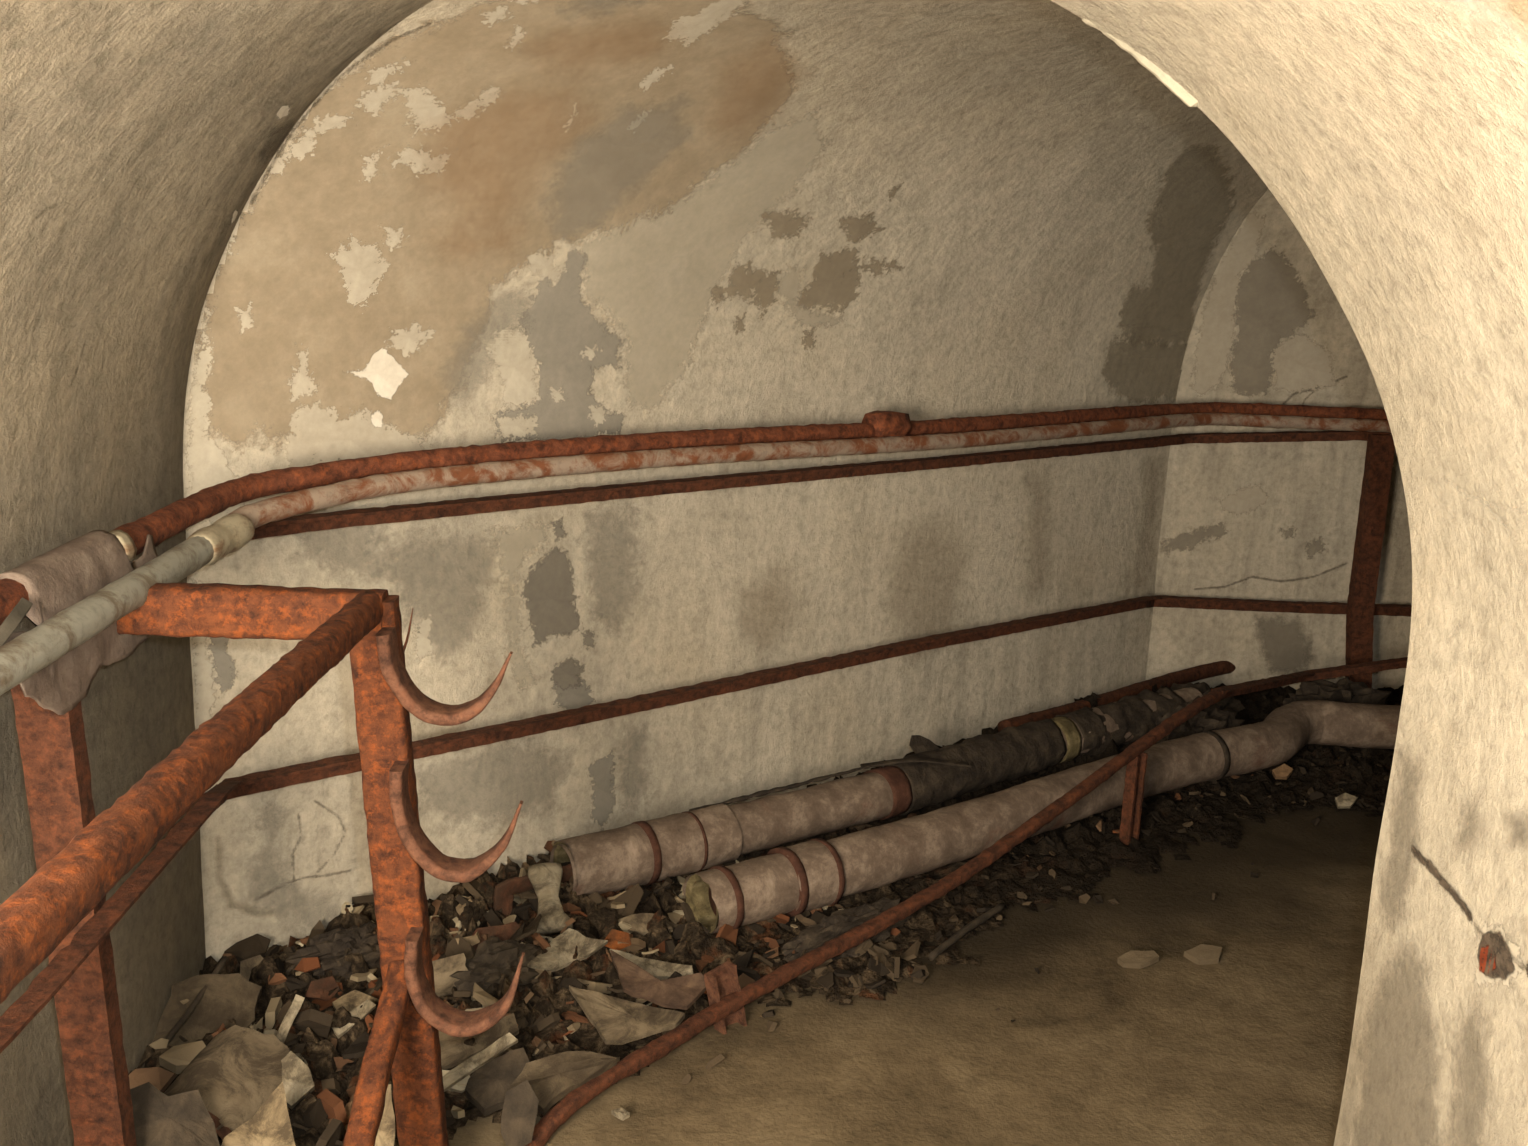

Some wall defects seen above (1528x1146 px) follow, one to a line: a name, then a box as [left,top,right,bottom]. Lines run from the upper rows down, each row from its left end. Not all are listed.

peeling [184,0,794,497]
spalling [710,209,902,350]
damp [1102,146,1234,403]
peeling [190,502,245,529]
spalling [491,518,595,690]
peeling [192,637,220,729]
crack [1411,846,1472,921]